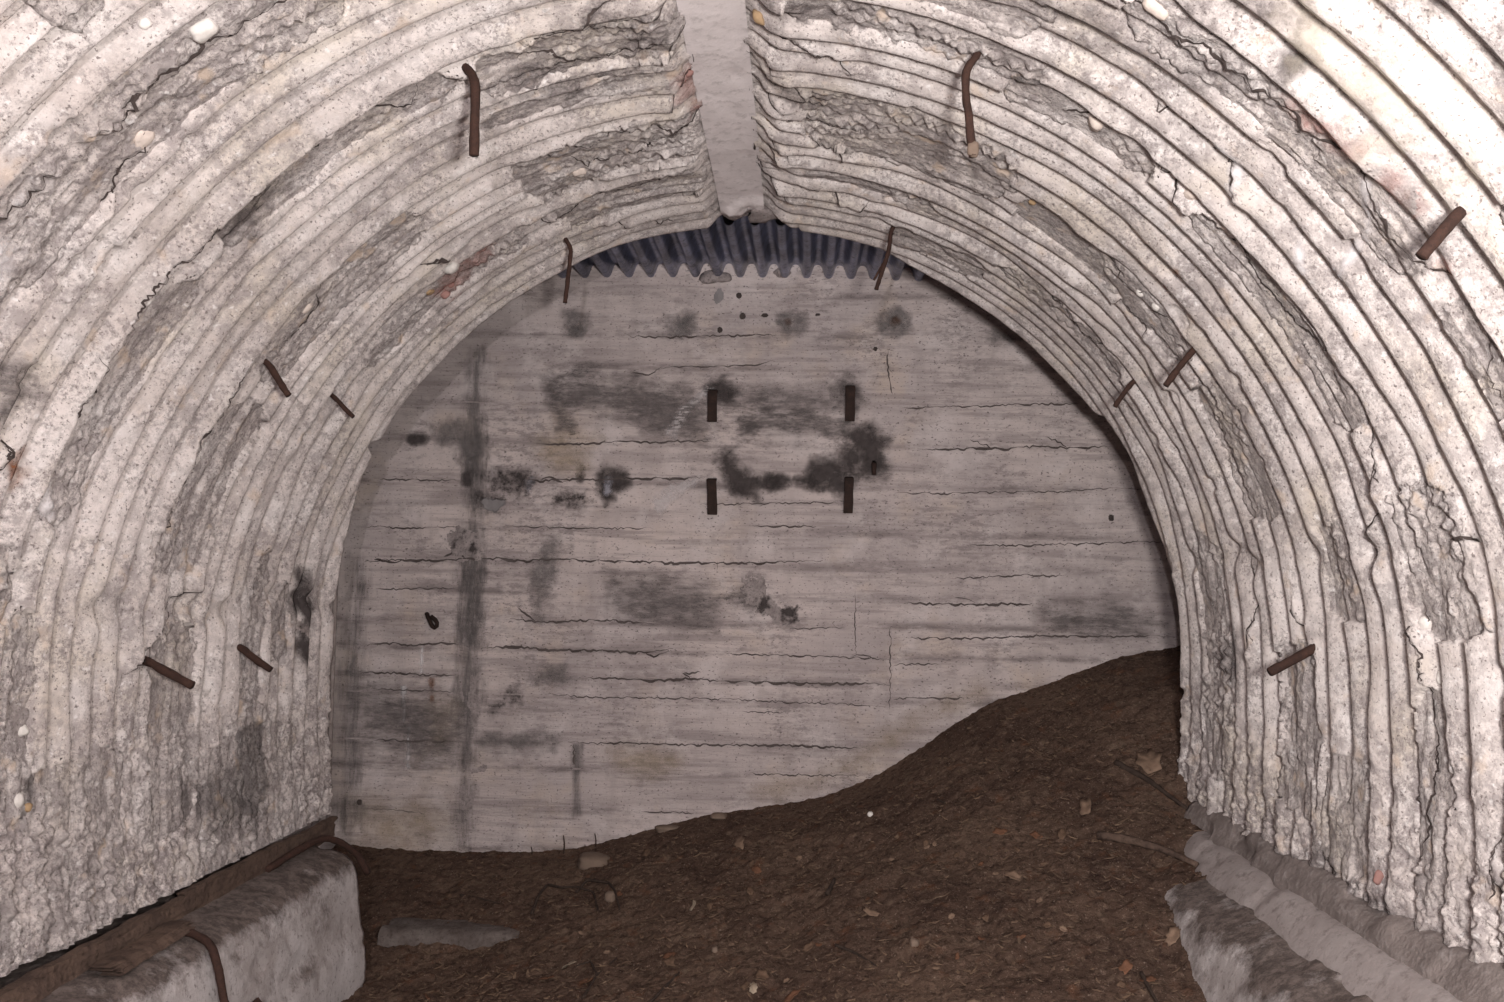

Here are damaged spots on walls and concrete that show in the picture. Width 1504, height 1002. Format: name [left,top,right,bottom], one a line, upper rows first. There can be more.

spalling [212,10,694,247]
spalling [510,111,710,303]
spalling [714,288,724,304]
spalling [784,0,1284,524]
leakage [406,348,534,538]
leakage [555,468,630,507]
leakage [546,369,701,435]
leakage [848,423,889,469]